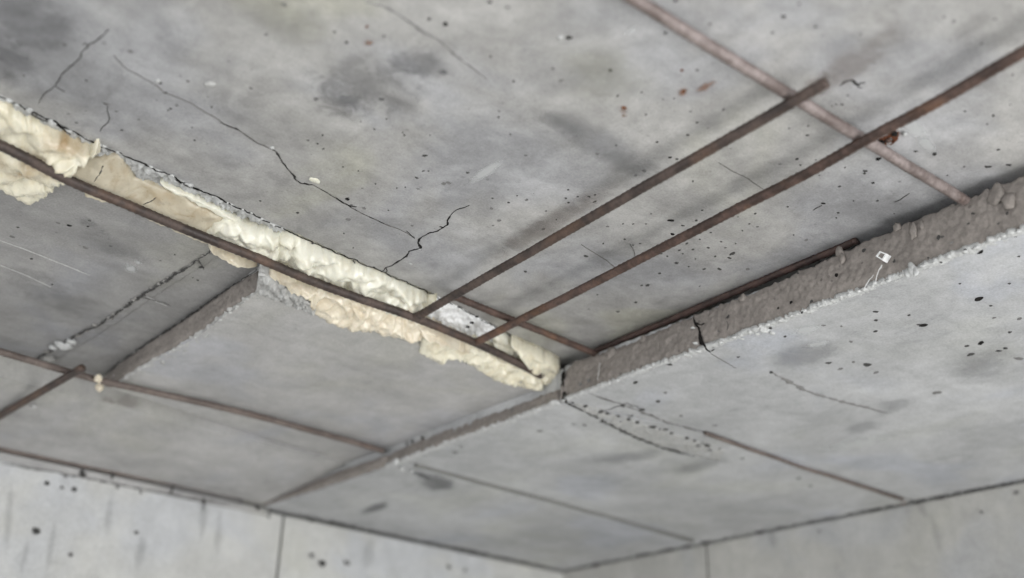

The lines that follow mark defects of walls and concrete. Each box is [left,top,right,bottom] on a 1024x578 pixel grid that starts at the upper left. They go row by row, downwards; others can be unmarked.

crack [0,29,511,336]
spalling [0,0,1024,454]